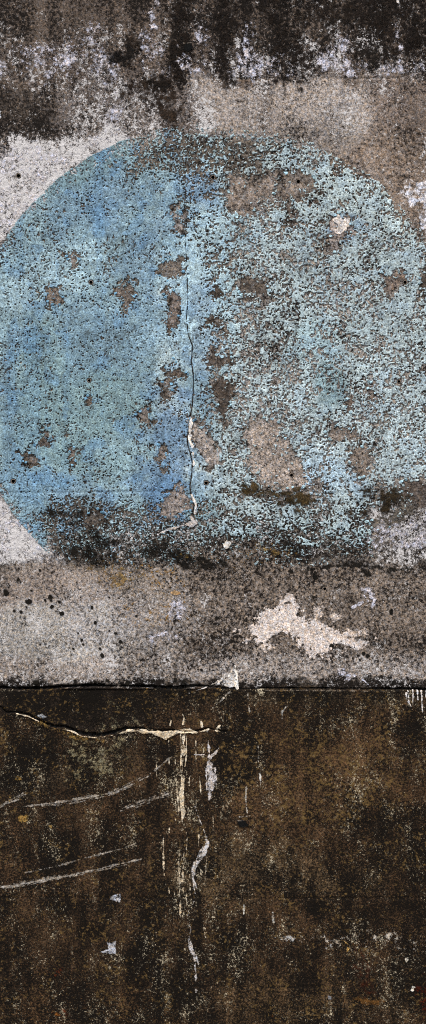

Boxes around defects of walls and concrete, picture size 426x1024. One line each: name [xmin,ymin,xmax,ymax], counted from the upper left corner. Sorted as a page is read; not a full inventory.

damp [22,0,426,148]
peeling [226,167,318,224]
peeling [113,280,138,309]
peeling [158,255,186,330]
peeling [242,416,310,492]
damp [44,503,124,566]
damp [137,494,239,571]
damp [277,492,314,514]
damp [349,487,413,536]
damp [3,577,64,616]
spalling [233,591,377,660]
crack [0,672,426,737]